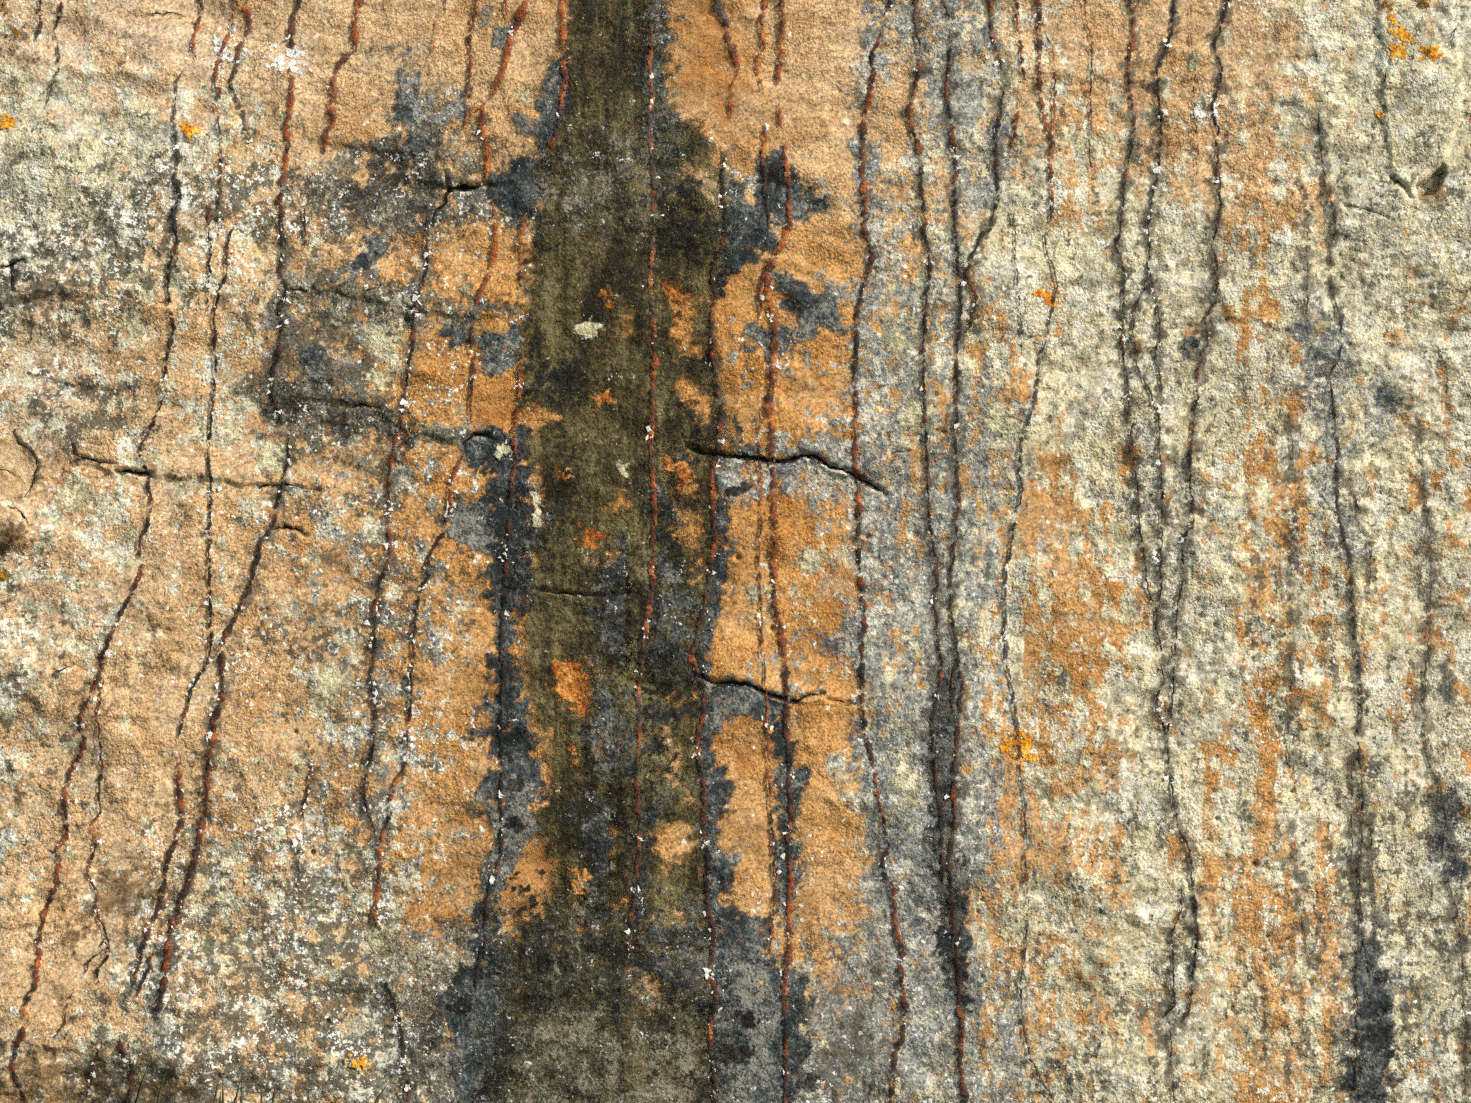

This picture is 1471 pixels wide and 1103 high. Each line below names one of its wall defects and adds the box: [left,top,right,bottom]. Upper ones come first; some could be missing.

rust [322,0,365,155]
rust [462,0,530,180]
rust [547,0,569,156]
rust [711,0,786,119]
rust [467,203,526,423]
crack [0,433,38,527]
crack [72,445,177,479]
crack [258,481,301,489]
damp [58,0,1019,1103]
rust [752,103,801,1103]
crack [688,446,882,491]
crack [700,675,857,705]